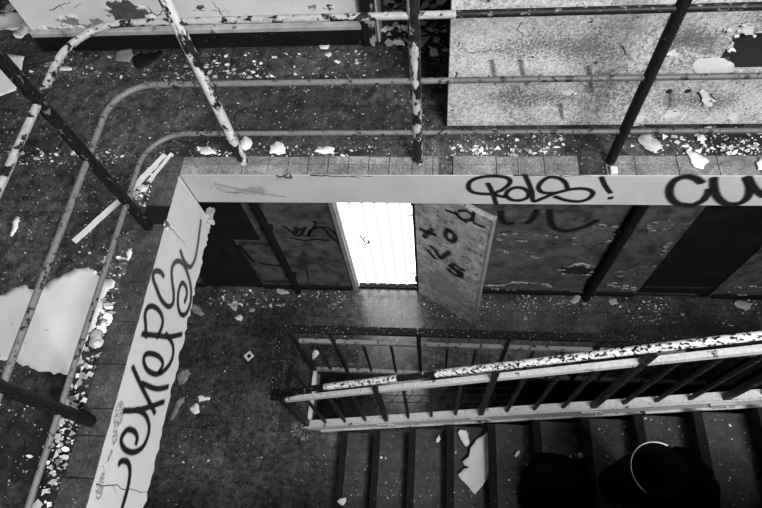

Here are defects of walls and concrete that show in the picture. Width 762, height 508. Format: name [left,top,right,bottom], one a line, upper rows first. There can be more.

peeling [37,0,160,30]
flaking render [723,22,757,53]
peeling [240,136,252,151]
peeling [557,263,595,276]
peeling [89,316,113,348]